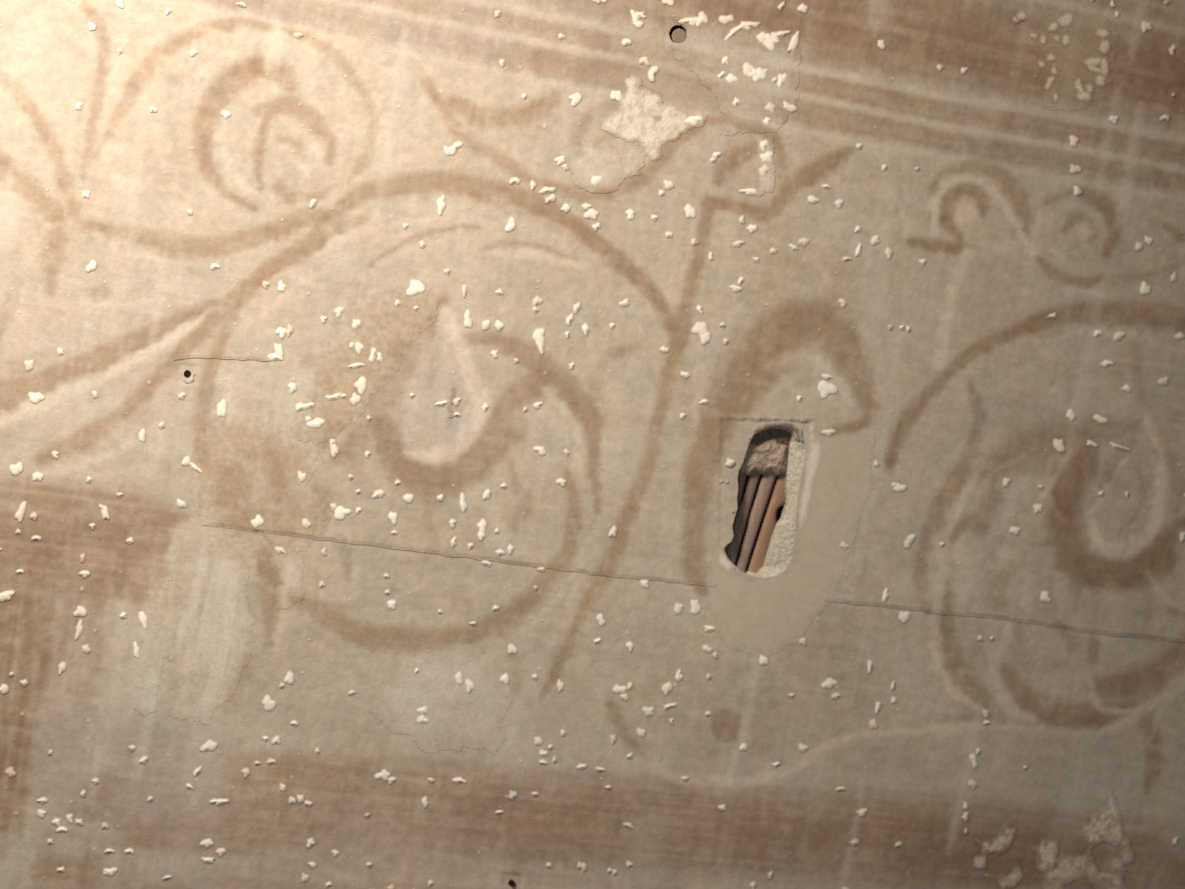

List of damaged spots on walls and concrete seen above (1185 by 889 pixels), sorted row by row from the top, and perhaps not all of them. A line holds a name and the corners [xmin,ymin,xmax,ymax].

flaking render [599,56,708,178]
peeling [738,140,774,195]
peeling [691,304,730,345]
spalling [741,426,806,578]
flaking render [961,747,1135,889]